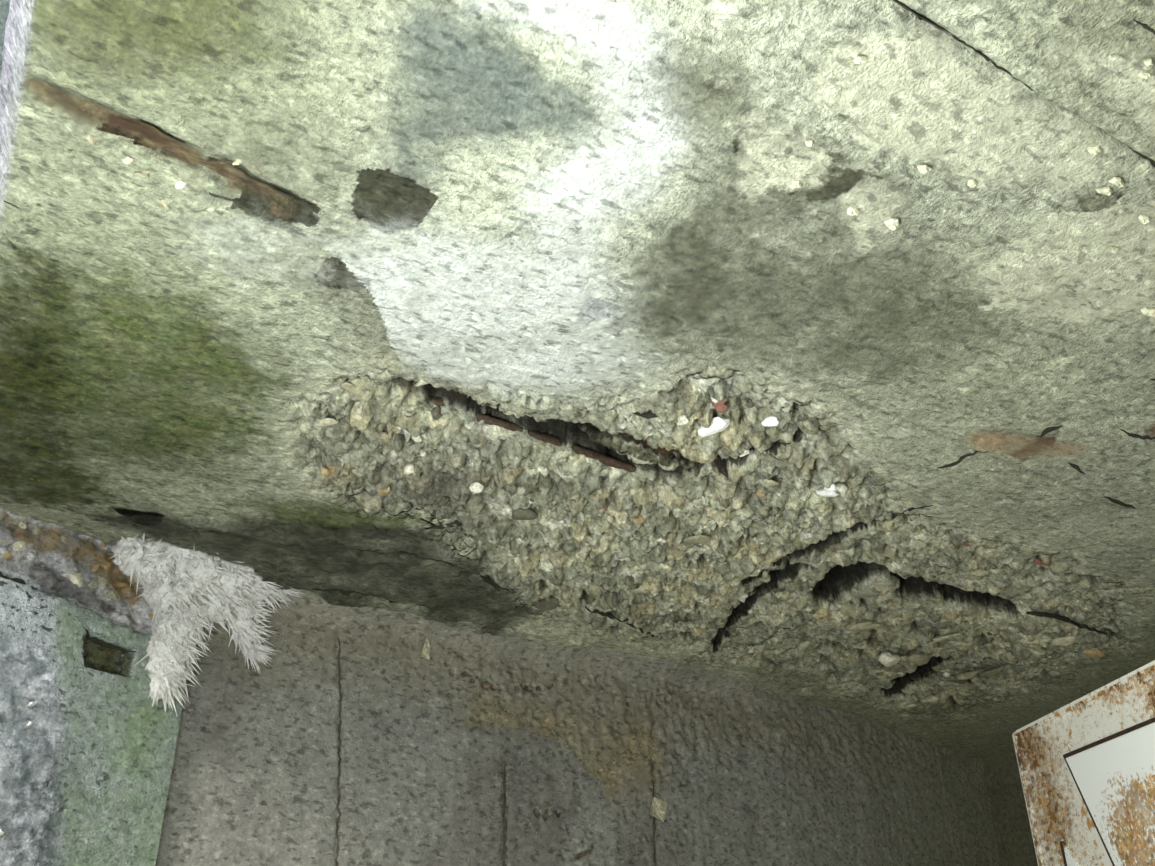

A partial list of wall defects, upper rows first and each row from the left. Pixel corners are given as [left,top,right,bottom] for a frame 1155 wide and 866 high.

leakage [405,14,580,137]
leakage [686,75,738,119]
leakage [650,181,937,365]
crack [394,375,821,483]
rust [1035,426,1063,444]
rust [1120,426,1155,440]
leakage [99,515,531,635]
spalling [294,367,1139,717]
crack [711,505,933,653]
rust [1014,664,1155,866]